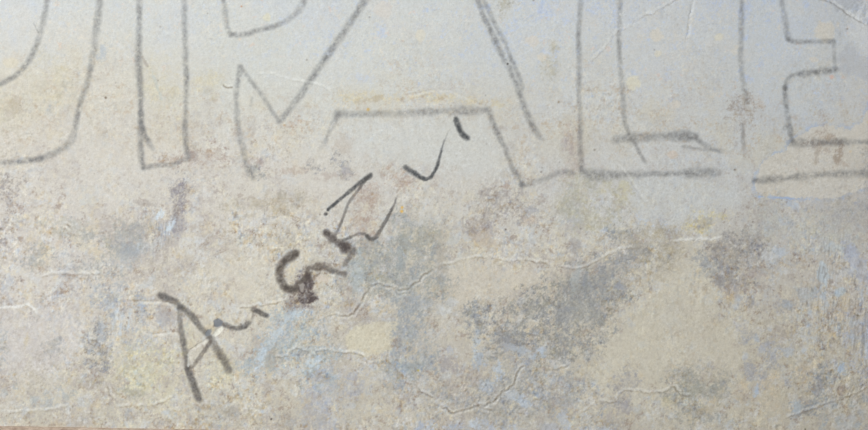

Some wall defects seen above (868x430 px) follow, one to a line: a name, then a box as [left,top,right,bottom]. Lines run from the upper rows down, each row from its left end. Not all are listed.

crack [325,264,439,320]